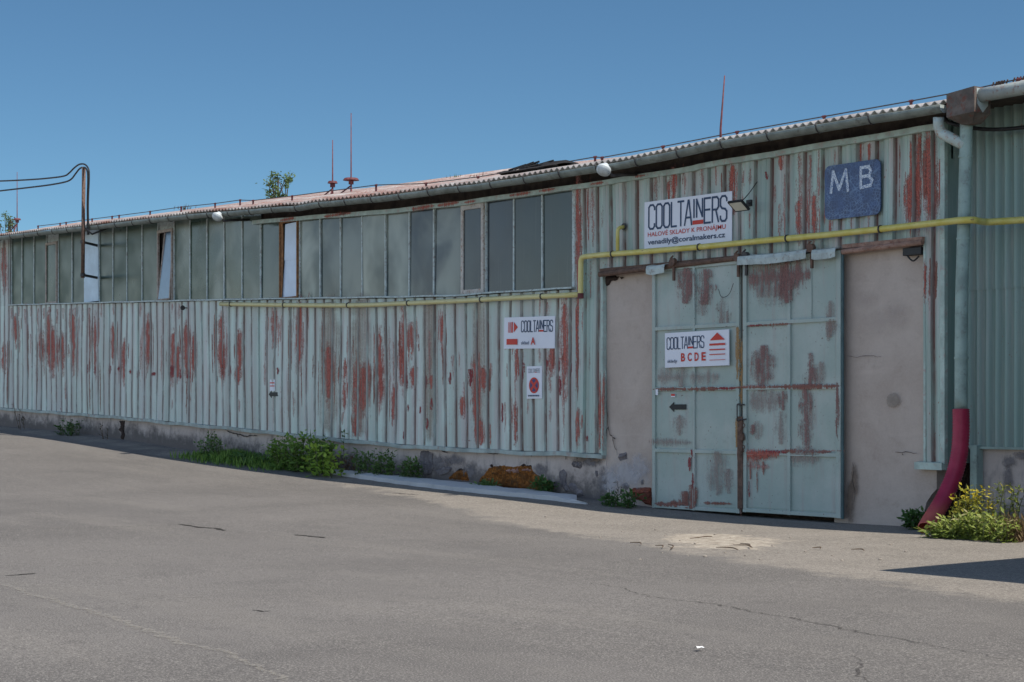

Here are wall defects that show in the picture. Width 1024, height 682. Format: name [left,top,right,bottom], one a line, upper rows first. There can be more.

rust [312,310,376,437]
rust [465,353,493,445]
rust [653,268,840,463]
spalling [419,450,585,497]
spalling [622,479,652,506]
rust [655,485,741,513]